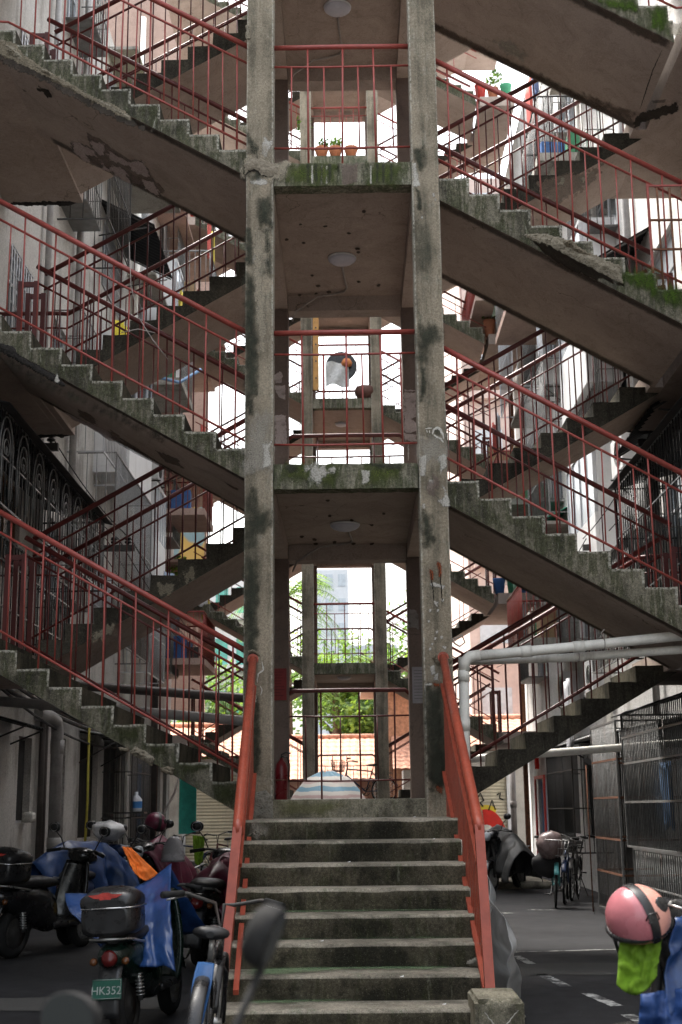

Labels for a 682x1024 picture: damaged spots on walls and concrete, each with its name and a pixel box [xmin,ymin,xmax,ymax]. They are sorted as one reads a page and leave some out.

peeling [70,133,164,198]
damp [131,118,261,181]
damp [414,147,424,170]
damp [440,202,682,329]
spalling [524,233,624,286]
damp [138,187,273,415]
damp [442,274,651,384]
peeling [305,462,336,483]
peeling [403,390,449,506]